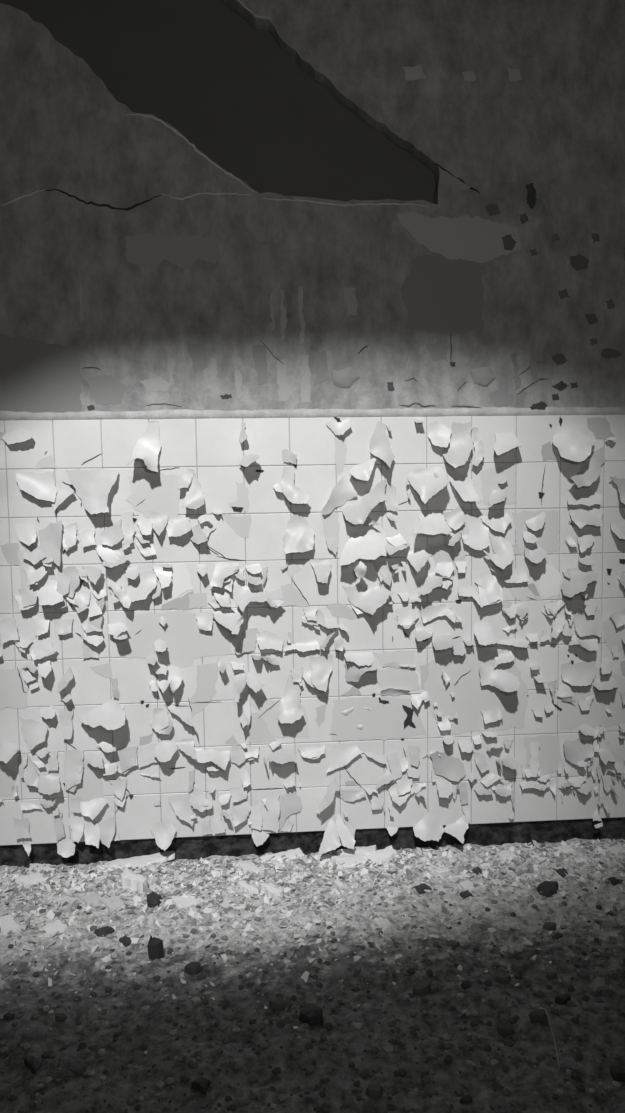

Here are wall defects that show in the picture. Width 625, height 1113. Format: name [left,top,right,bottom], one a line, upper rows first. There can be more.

crack [2,114,430,211]
spalling [0,0,538,263]
peeling [0,417,625,873]